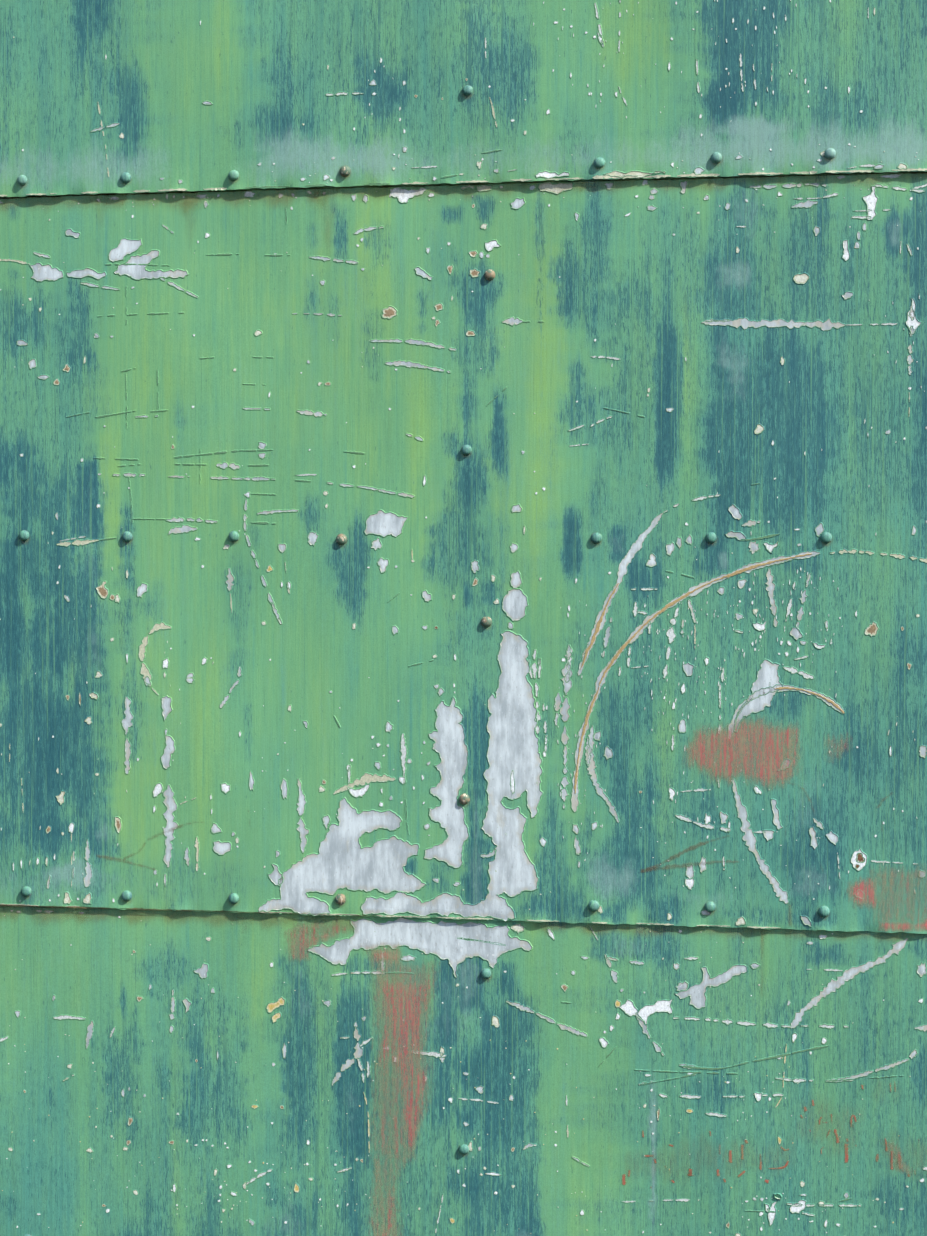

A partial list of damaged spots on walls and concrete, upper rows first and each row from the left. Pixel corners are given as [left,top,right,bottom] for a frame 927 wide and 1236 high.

peeling [0,238,199,299]
peeling [258,493,927,979]
peeling [604,954,618,984]
peeling [506,962,918,1108]